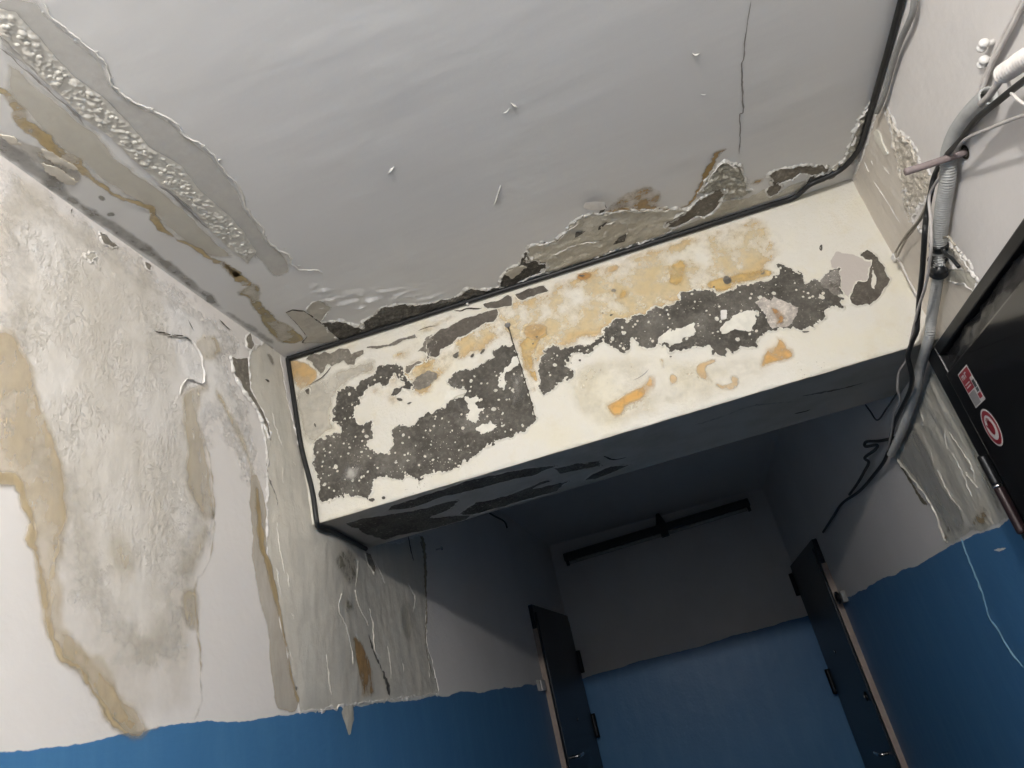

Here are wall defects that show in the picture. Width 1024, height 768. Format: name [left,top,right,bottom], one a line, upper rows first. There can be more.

peeling [41,2,323,274]
crack [739,3,751,150]
water stain [457,240,696,380]
water stain [708,225,772,291]
water stain [0,472,38,558]
water stain [291,361,372,439]
peeling [0,101,980,735]
peeling [893,370,1009,544]
water stain [42,568,74,666]
water stain [250,475,299,711]